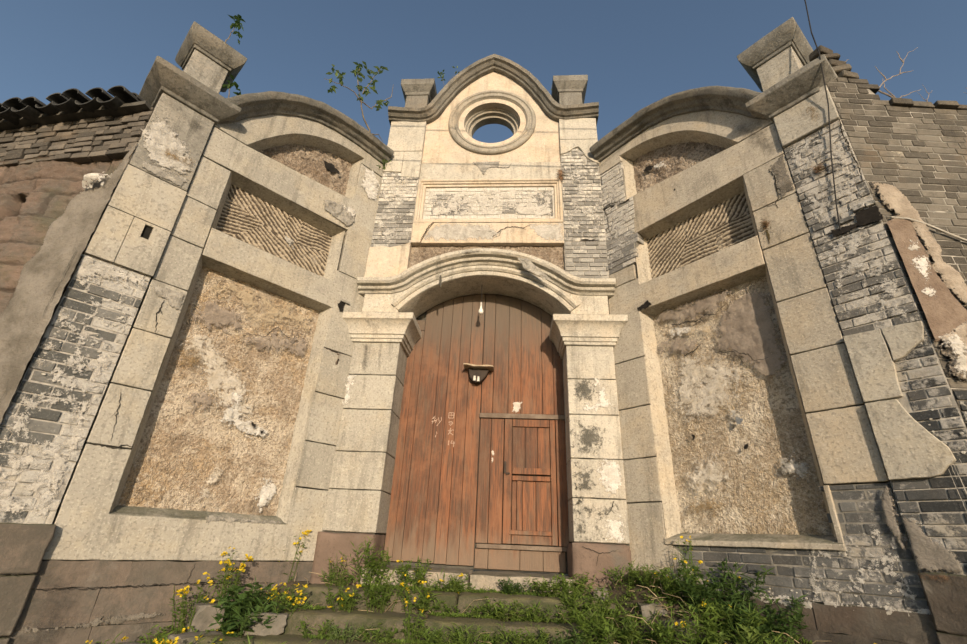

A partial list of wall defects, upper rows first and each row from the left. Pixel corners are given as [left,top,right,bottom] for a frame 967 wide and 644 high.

spalling [323,200,356,226]
spalling [0,116,313,525]
spalling [656,120,967,616]
flaking render [583,377,613,414]
crack [88,395,131,449]
flaking render [596,457,623,496]
flaking render [603,515,624,543]